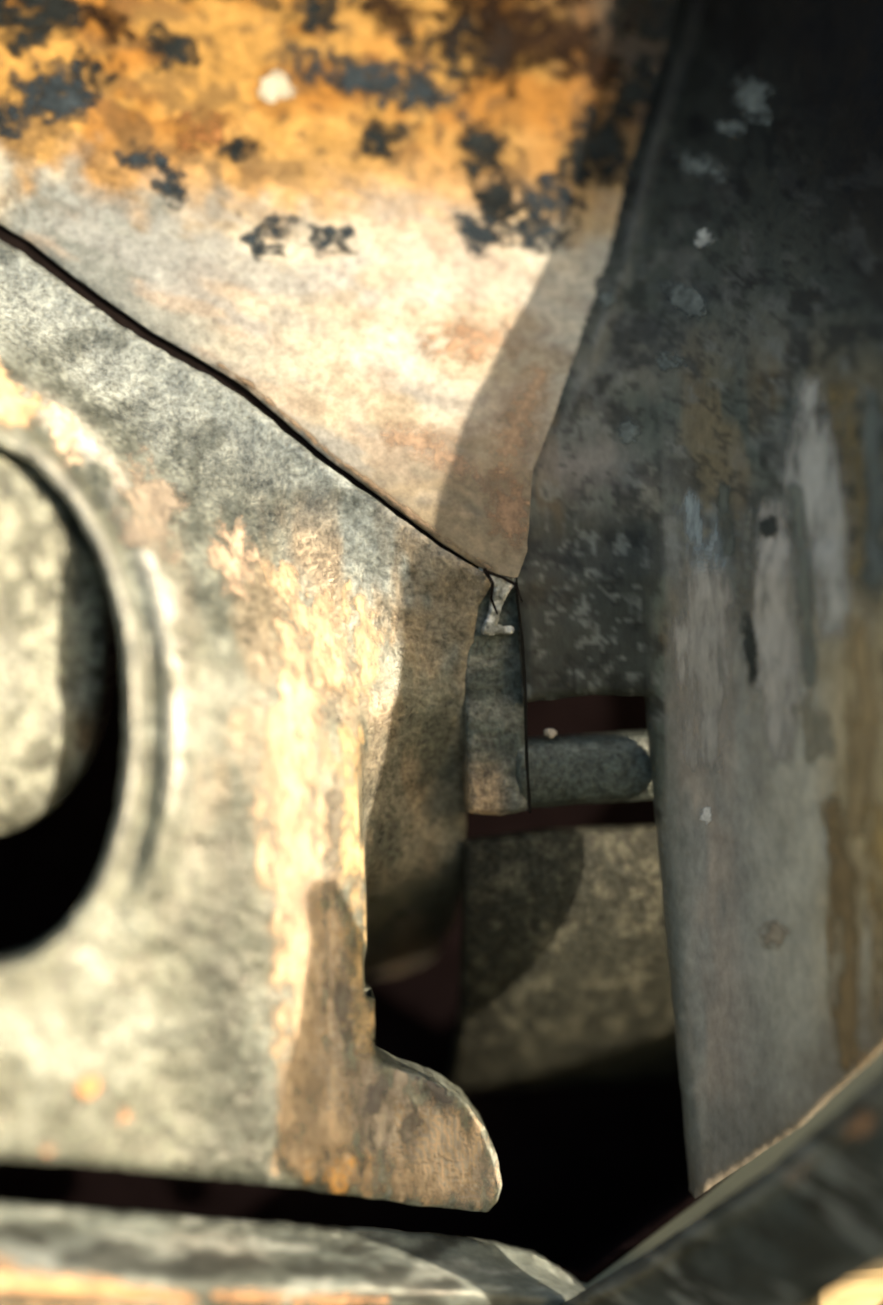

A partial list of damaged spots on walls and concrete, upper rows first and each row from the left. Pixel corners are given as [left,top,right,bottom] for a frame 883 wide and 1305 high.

corrosion [792,619,883,1070]